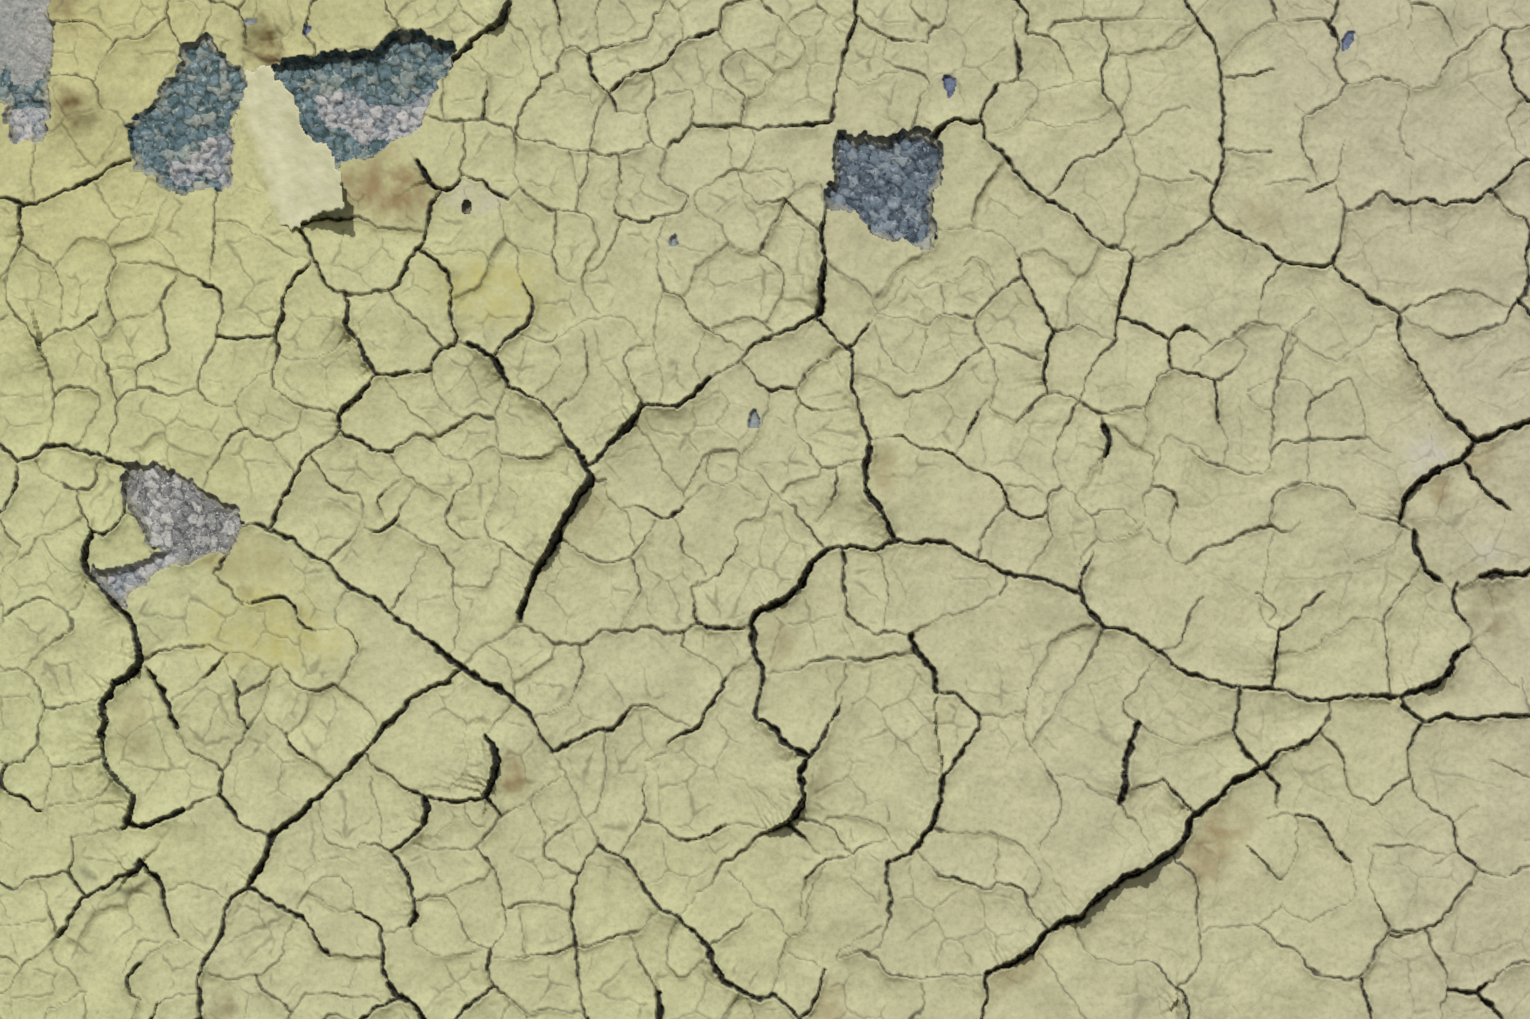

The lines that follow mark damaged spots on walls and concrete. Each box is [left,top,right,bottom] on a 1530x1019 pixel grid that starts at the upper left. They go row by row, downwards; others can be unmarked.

flaking render [0,0,56,144]
crack [50,0,182,134]
peeling [125,28,457,231]
peeling [823,126,944,250]
peeling [91,460,245,609]
crack [0,142,476,1019]